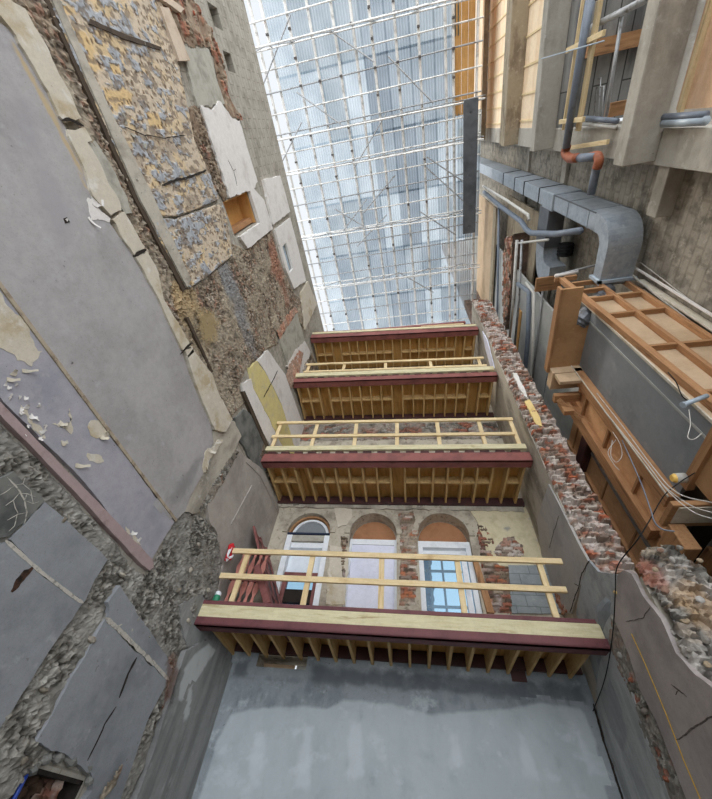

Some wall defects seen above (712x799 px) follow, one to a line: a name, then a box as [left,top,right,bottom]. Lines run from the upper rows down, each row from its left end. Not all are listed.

peeling [11,0,304,418]
peeling [0,292,73,446]
peeling [87,420,110,440]
spalling [286,350,318,388]
spalling [472,232,712,682]
crack [0,477,84,603]
spalling [0,425,239,799]
crack [570,561,589,612]
crack [87,617,169,761]
crack [676,716,712,740]